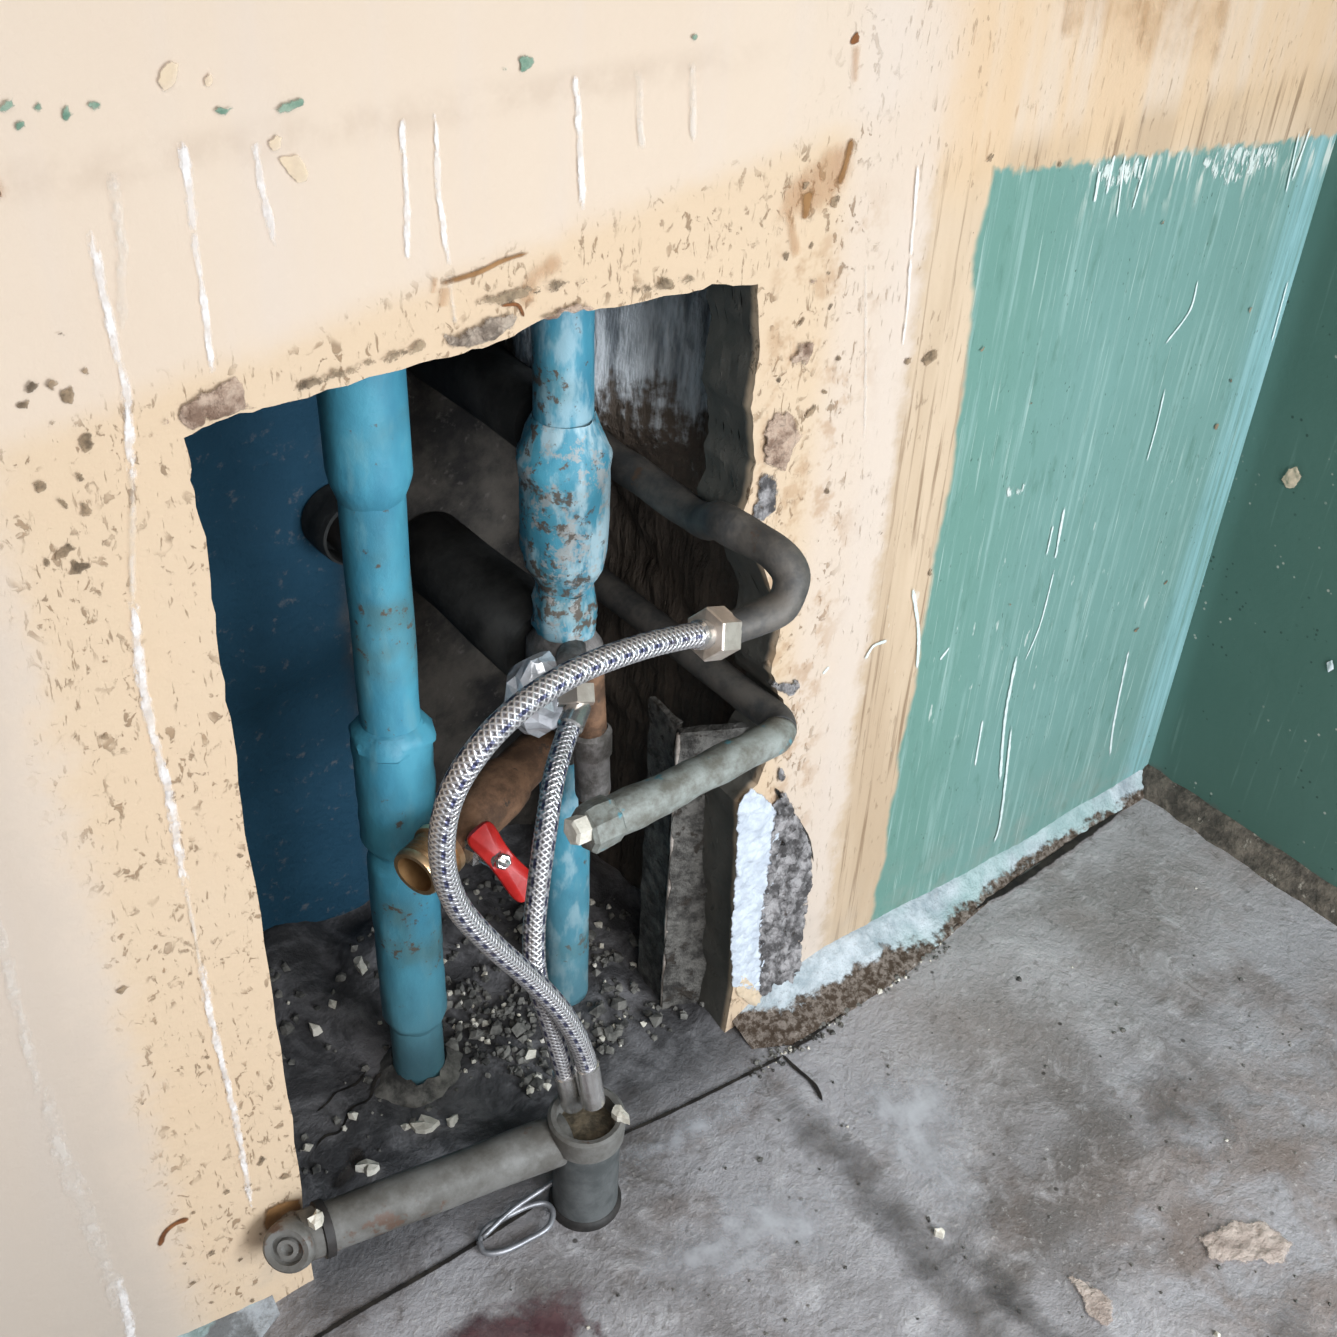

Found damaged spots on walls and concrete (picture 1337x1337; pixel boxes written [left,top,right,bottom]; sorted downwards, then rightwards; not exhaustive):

corrosion [838,139,854,184]
corrosion [803,192,813,219]
spalling [444,281,566,348]
peeling [17,380,74,408]
spalling [753,390,827,521]
peeling [44,544,91,575]
spalling [730,768,814,1006]
peeling [410,1114,458,1134]
peeling [611,1105,630,1125]
peeling [355,1159,380,1177]
peeling [307,1209,324,1230]
spalling [1199,1220,1292,1264]